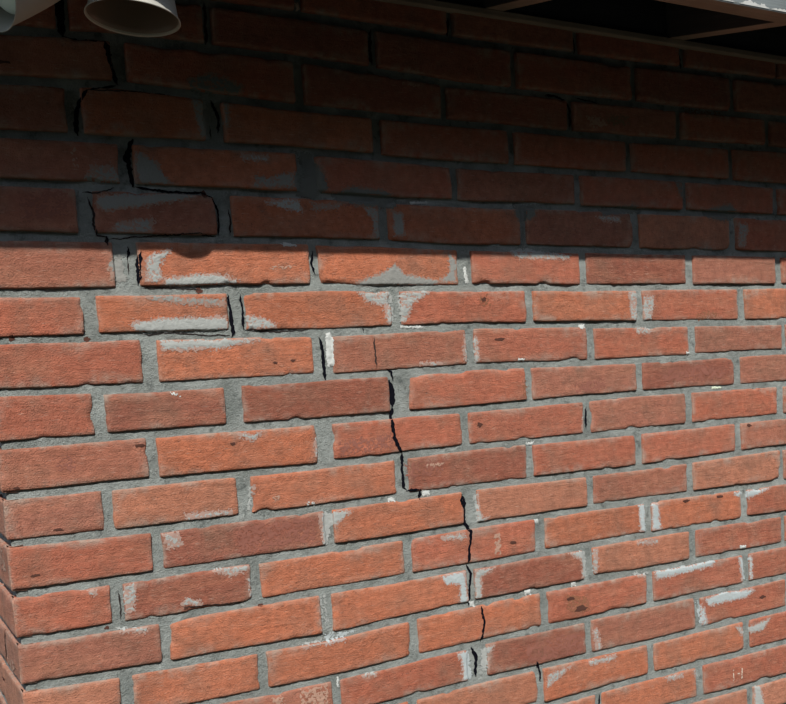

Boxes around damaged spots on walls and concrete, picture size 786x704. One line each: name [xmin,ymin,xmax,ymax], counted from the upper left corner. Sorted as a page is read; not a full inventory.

crack [54,0,170,136]
crack [82,139,232,290]
crack [143,294,326,380]
crack [362,328,422,498]
crack [460,496,486,677]